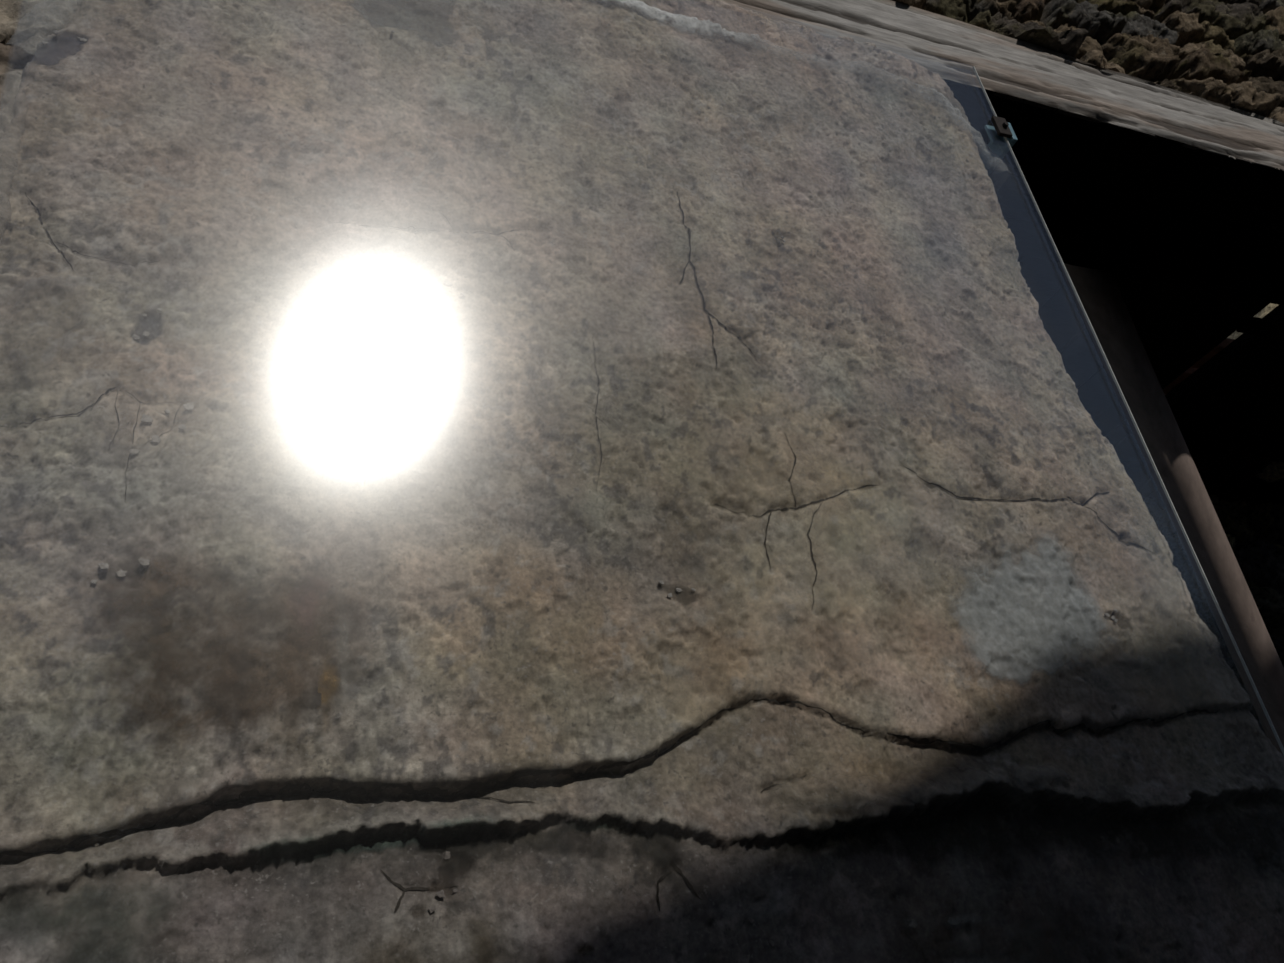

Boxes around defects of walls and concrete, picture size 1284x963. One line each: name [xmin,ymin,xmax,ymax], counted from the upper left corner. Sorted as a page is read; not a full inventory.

crack [677,192,758,368]
crack [0,387,182,497]
crack [714,432,878,609]
crack [904,466,1156,555]
water stain [100,559,354,736]
water stain [785,788,1284,881]